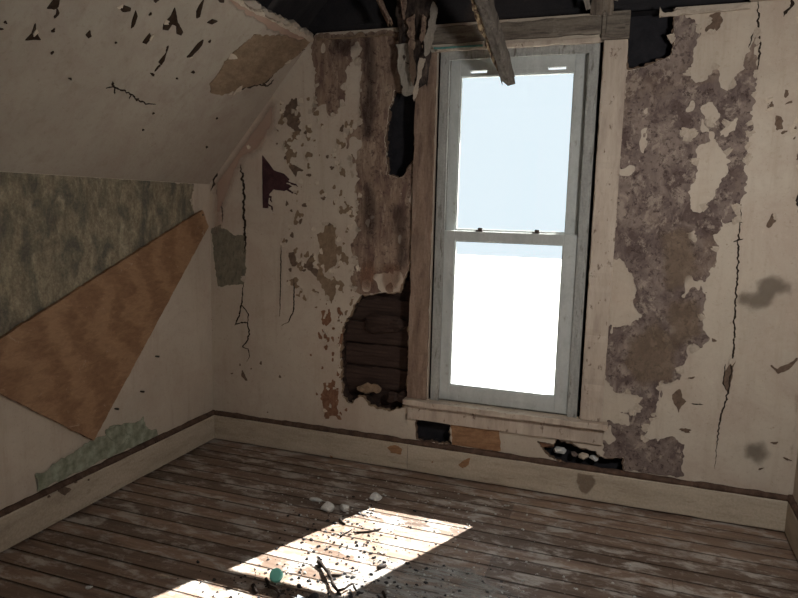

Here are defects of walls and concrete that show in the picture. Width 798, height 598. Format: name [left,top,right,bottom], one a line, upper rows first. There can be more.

crack [106,81,156,105]
peeling [209,29,415,420]
peeling [537,9,798,478]
crack [235,284,250,359]
crack [714,204,743,468]
water stain [741,279,785,305]
peeling [415,420,501,451]